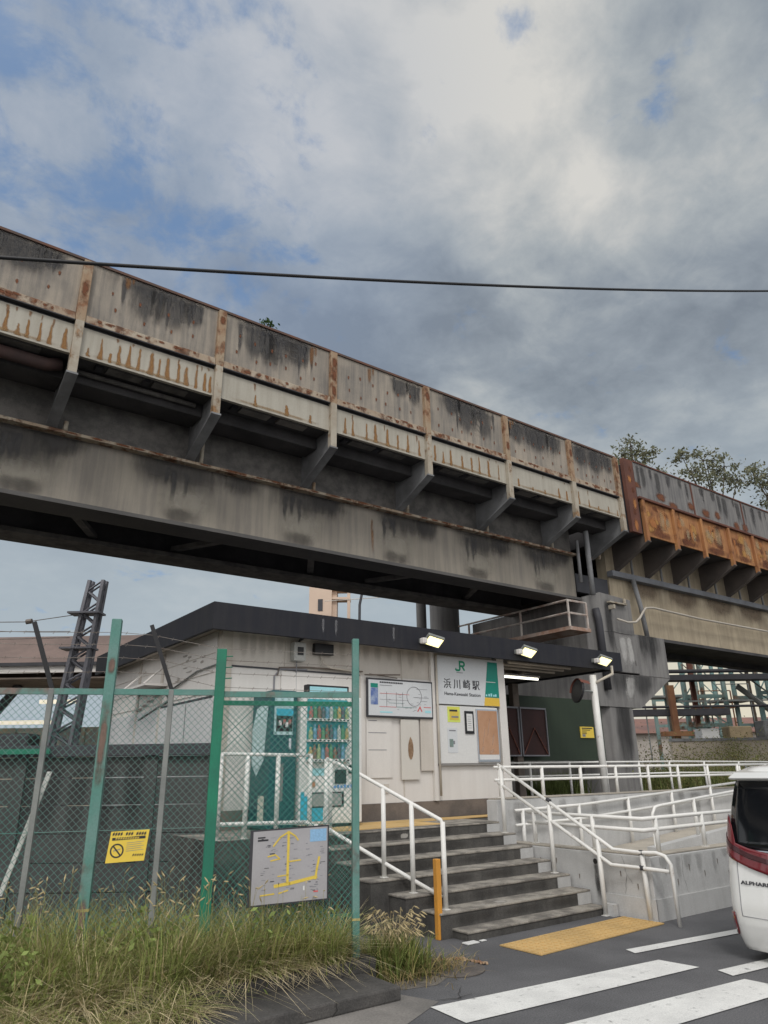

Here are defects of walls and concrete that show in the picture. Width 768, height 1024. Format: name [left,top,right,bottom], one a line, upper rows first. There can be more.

rust [0,279,68,349]
damp [122,280,203,326]
rust [86,322,211,393]
damp [238,324,313,369]
damp [393,378,420,402]
damp [444,395,494,435]
damp [0,422,82,482]
damp [141,456,256,514]
rust [434,413,619,516]
damp [508,422,611,472]
damp [281,489,339,537]
damp [382,513,435,557]